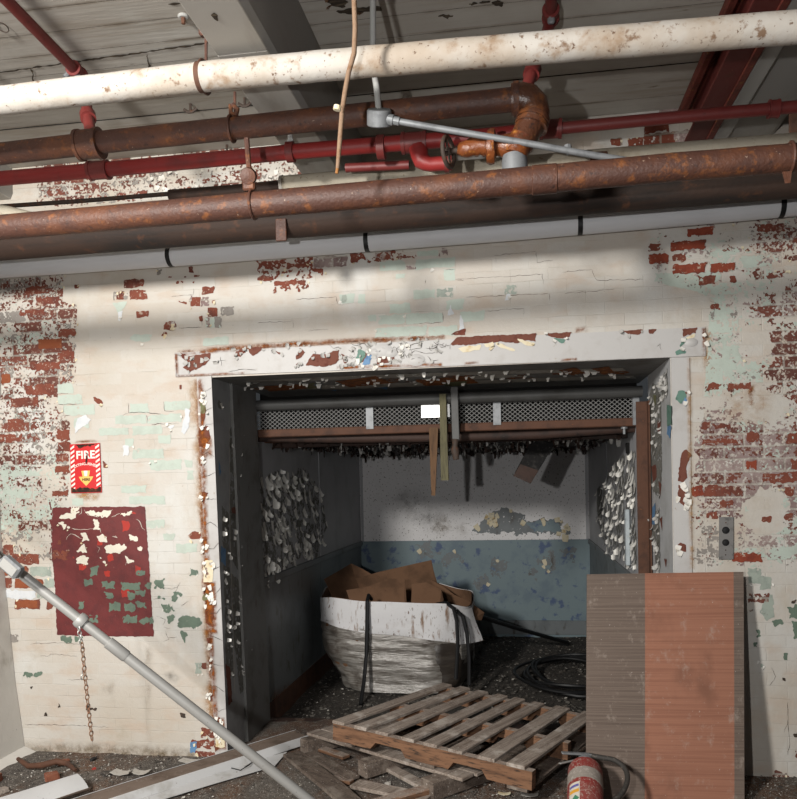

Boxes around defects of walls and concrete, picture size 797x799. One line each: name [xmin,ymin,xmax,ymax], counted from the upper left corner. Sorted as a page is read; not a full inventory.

crack [0,43,204,81]
peeling [156,248,636,391]
peeling [0,274,245,705]
rust [197,415,224,726]
peeling [260,468,328,588]
peeling [272,439,539,463]
peeling [472,507,577,581]
peeling [548,433,637,570]
peeling [647,216,797,639]